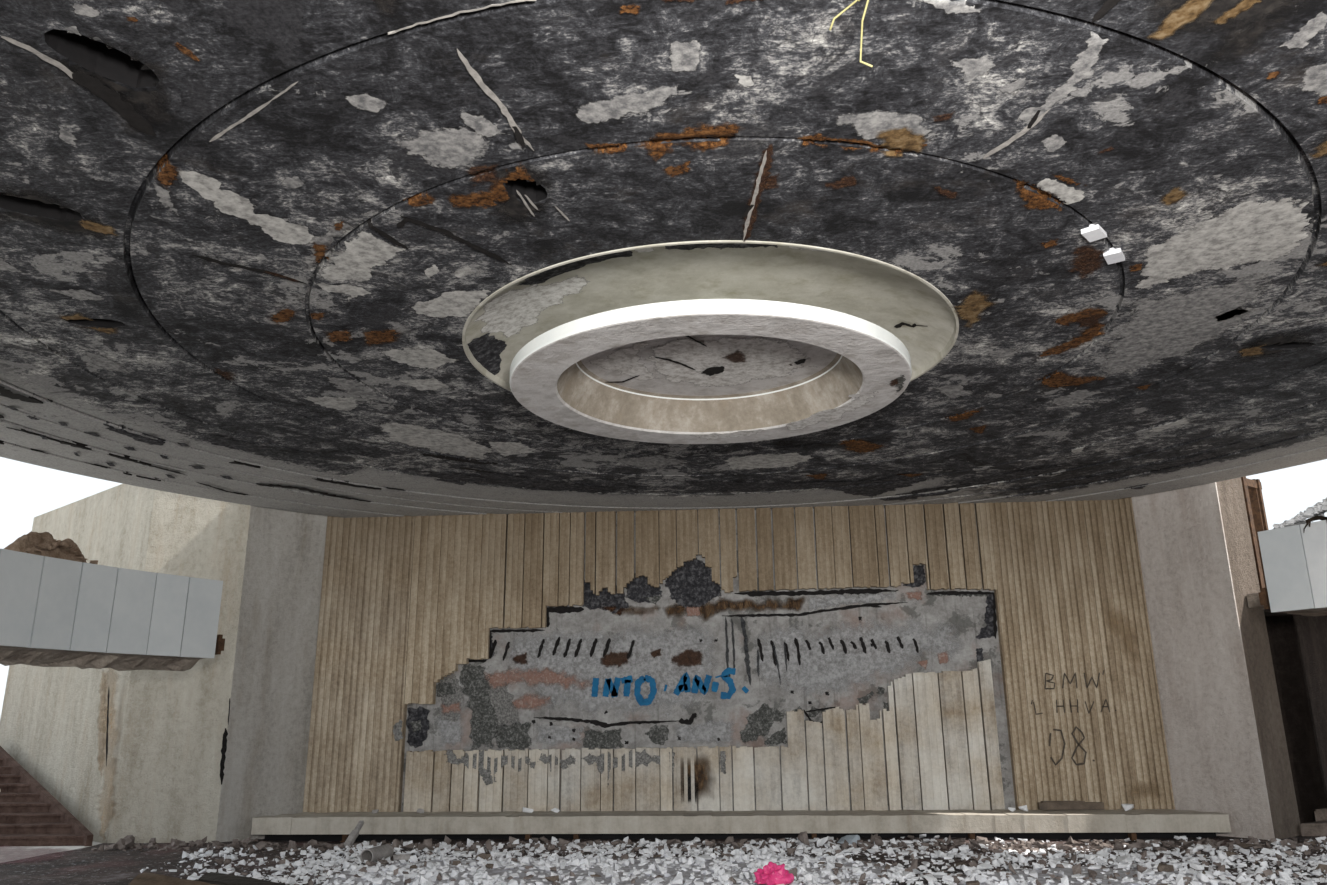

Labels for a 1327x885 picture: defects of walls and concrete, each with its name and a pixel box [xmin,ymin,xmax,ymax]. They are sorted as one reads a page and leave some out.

corrosion [1150,0,1261,39]
flaking render [346,94,387,113]
flaking render [397,107,501,169]
corrosion [586,124,739,177]
corrosion [799,127,927,157]
corrosion [402,165,497,209]
flaking render [153,170,405,302]
flaking render [1052,197,1316,407]
flaking render [934,384,973,399]
flaking render [1152,417,1189,432]
flaking render [393,557,998,786]